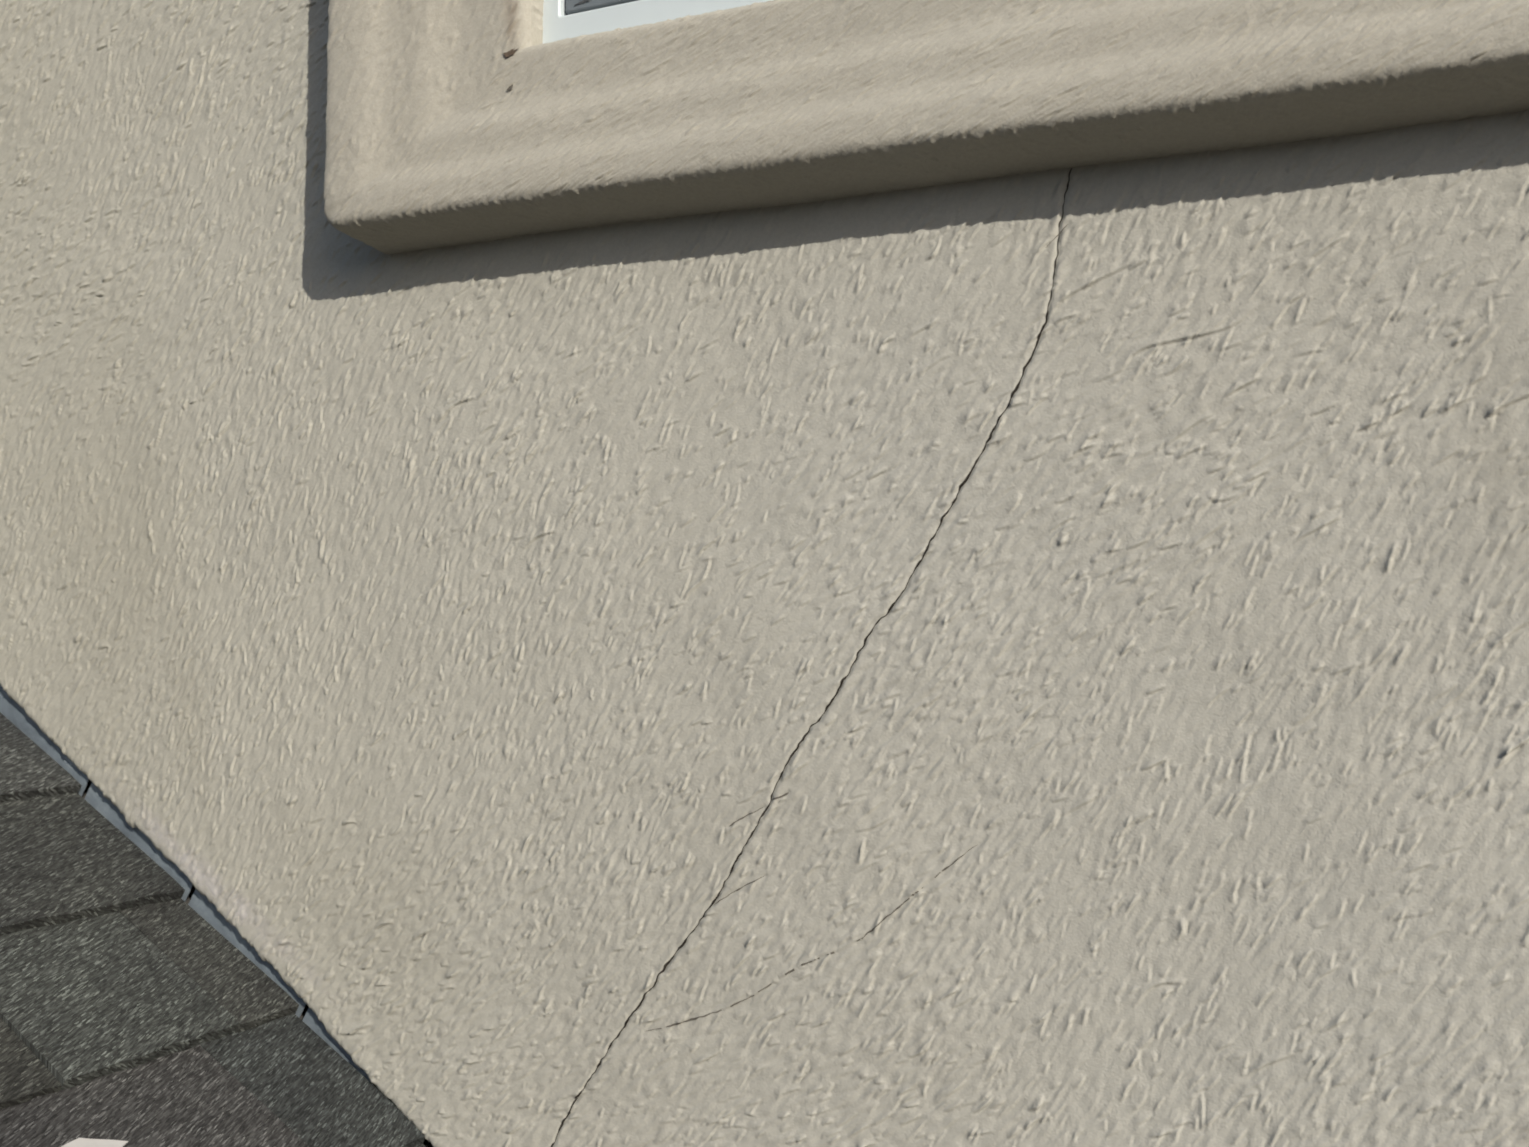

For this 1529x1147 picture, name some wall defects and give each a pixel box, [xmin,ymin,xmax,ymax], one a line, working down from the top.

crack [551,168,1072,1147]